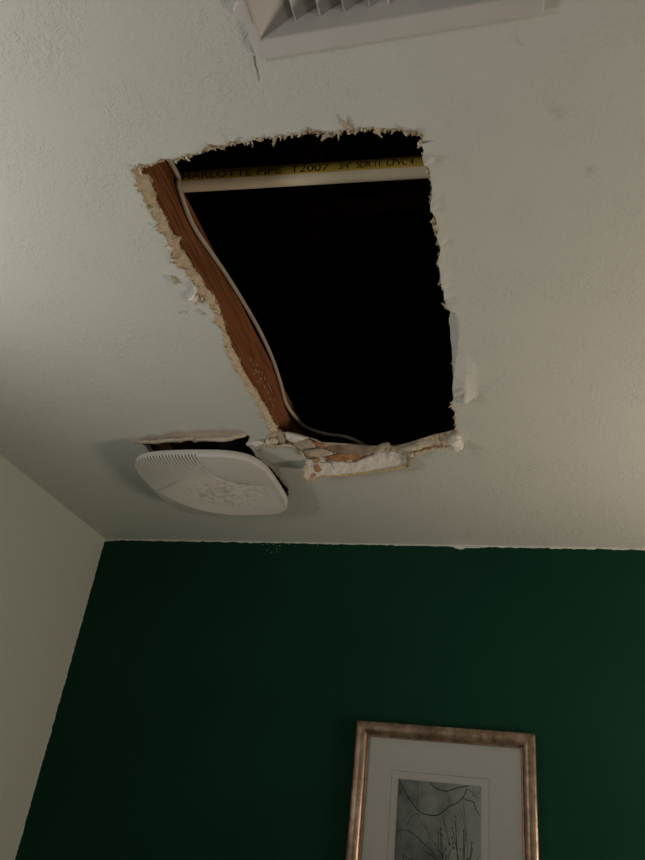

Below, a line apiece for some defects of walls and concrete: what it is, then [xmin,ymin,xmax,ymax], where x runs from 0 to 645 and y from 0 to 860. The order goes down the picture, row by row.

spalling [130,118,458,444]
spalling [360,384,460,458]